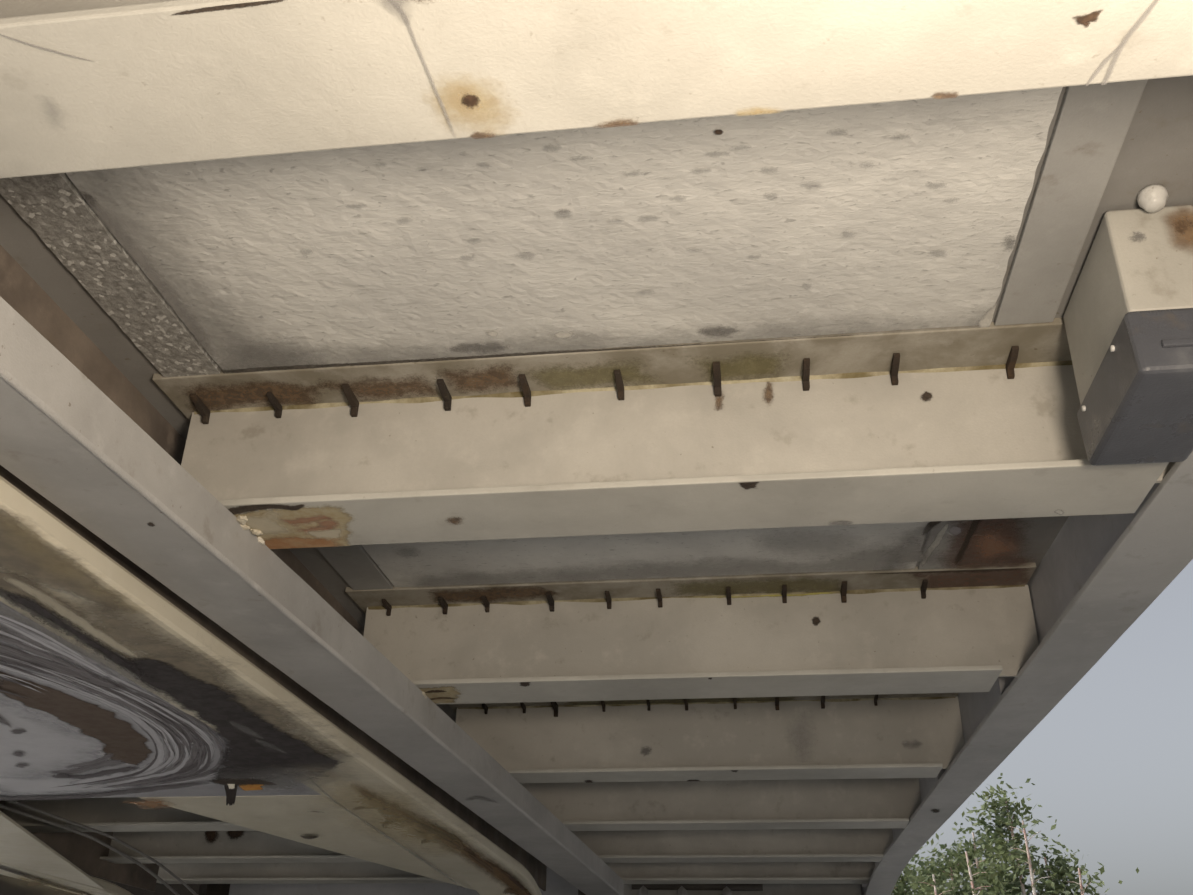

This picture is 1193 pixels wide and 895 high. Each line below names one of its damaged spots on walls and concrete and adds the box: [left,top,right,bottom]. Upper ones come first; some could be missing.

crack [388,0,450,124]
rust [462,95,478,107]
rust [186,378,434,412]
rust [441,366,520,393]
rust [535,366,647,388]
rust [707,356,780,403]
peeling [228,504,352,549]
rust [875,518,1029,588]
rust [433,586,556,602]
damp [0,509,340,801]